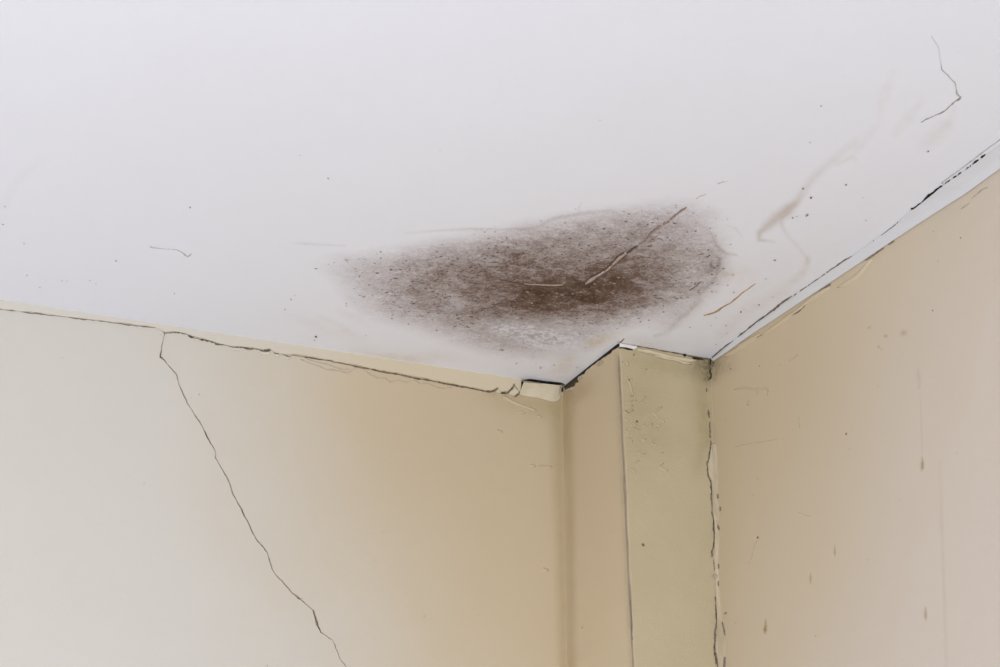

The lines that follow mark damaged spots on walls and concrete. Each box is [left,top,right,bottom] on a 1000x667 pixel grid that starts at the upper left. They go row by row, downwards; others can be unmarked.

crack [921,36,961,123]
damp [328,205,728,339]
crack [585,181,727,285]
peeling [486,374,584,402]
crack [618,139,1000,667]
crack [0,309,494,666]